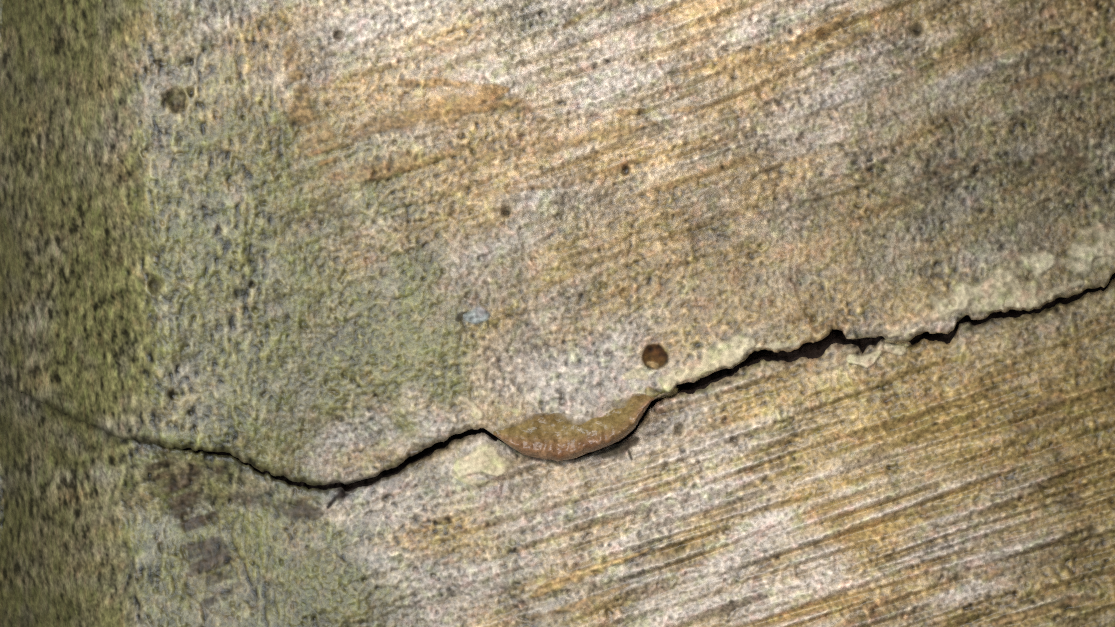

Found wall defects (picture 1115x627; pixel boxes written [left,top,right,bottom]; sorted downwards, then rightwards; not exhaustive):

crack [562,273,1115,461]
crack [173,428,509,509]